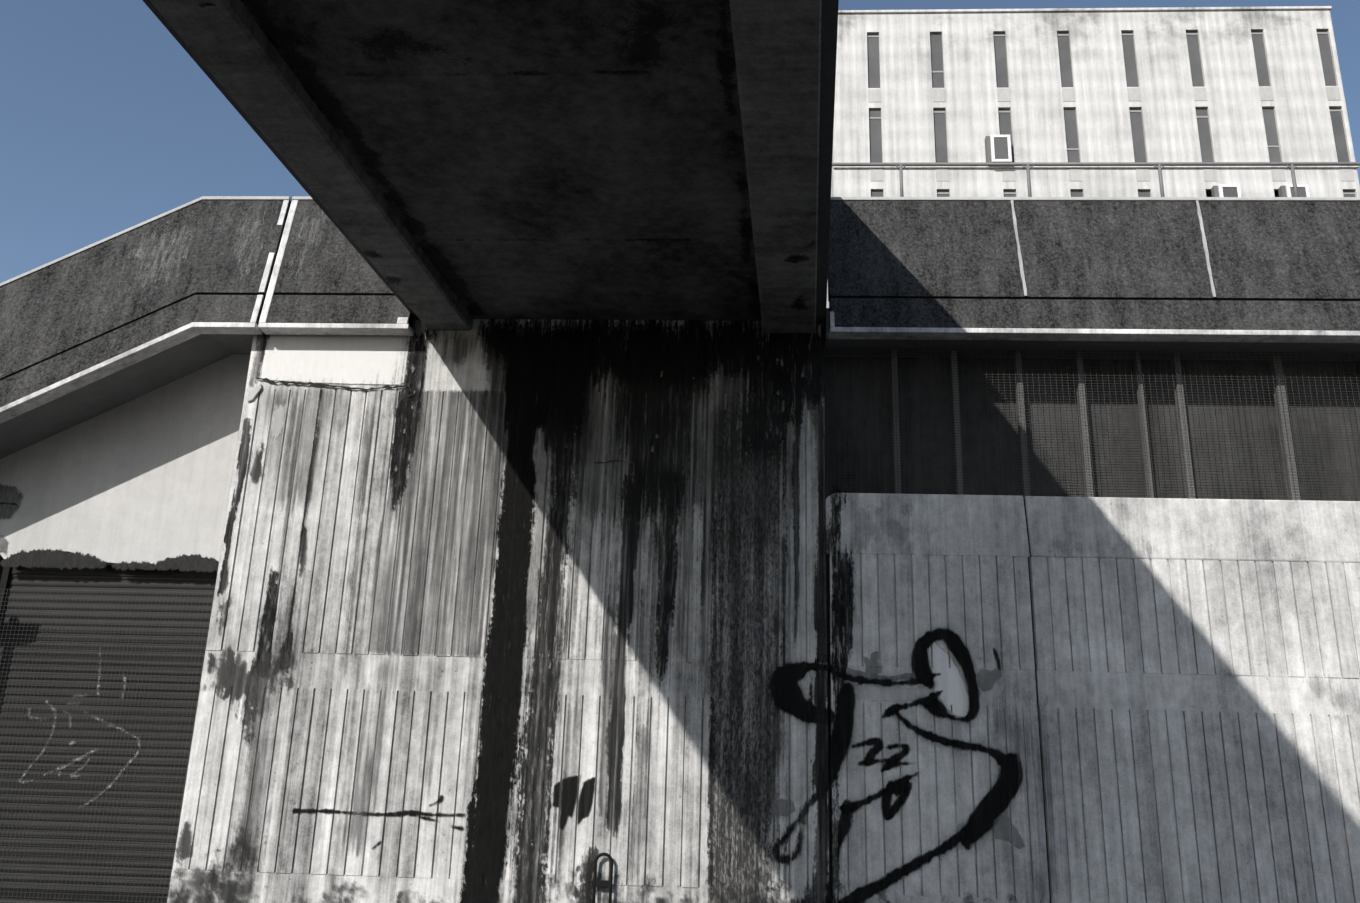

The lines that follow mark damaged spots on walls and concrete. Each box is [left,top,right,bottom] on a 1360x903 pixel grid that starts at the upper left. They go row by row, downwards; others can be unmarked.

flaking render [0,483,22,519]
spalling [0,536,219,573]
damp [217,418,252,596]
damp [249,333,322,679]
damp [346,331,509,682]
damp [519,329,864,903]
damp [344,705,383,855]
damp [498,820,622,903]